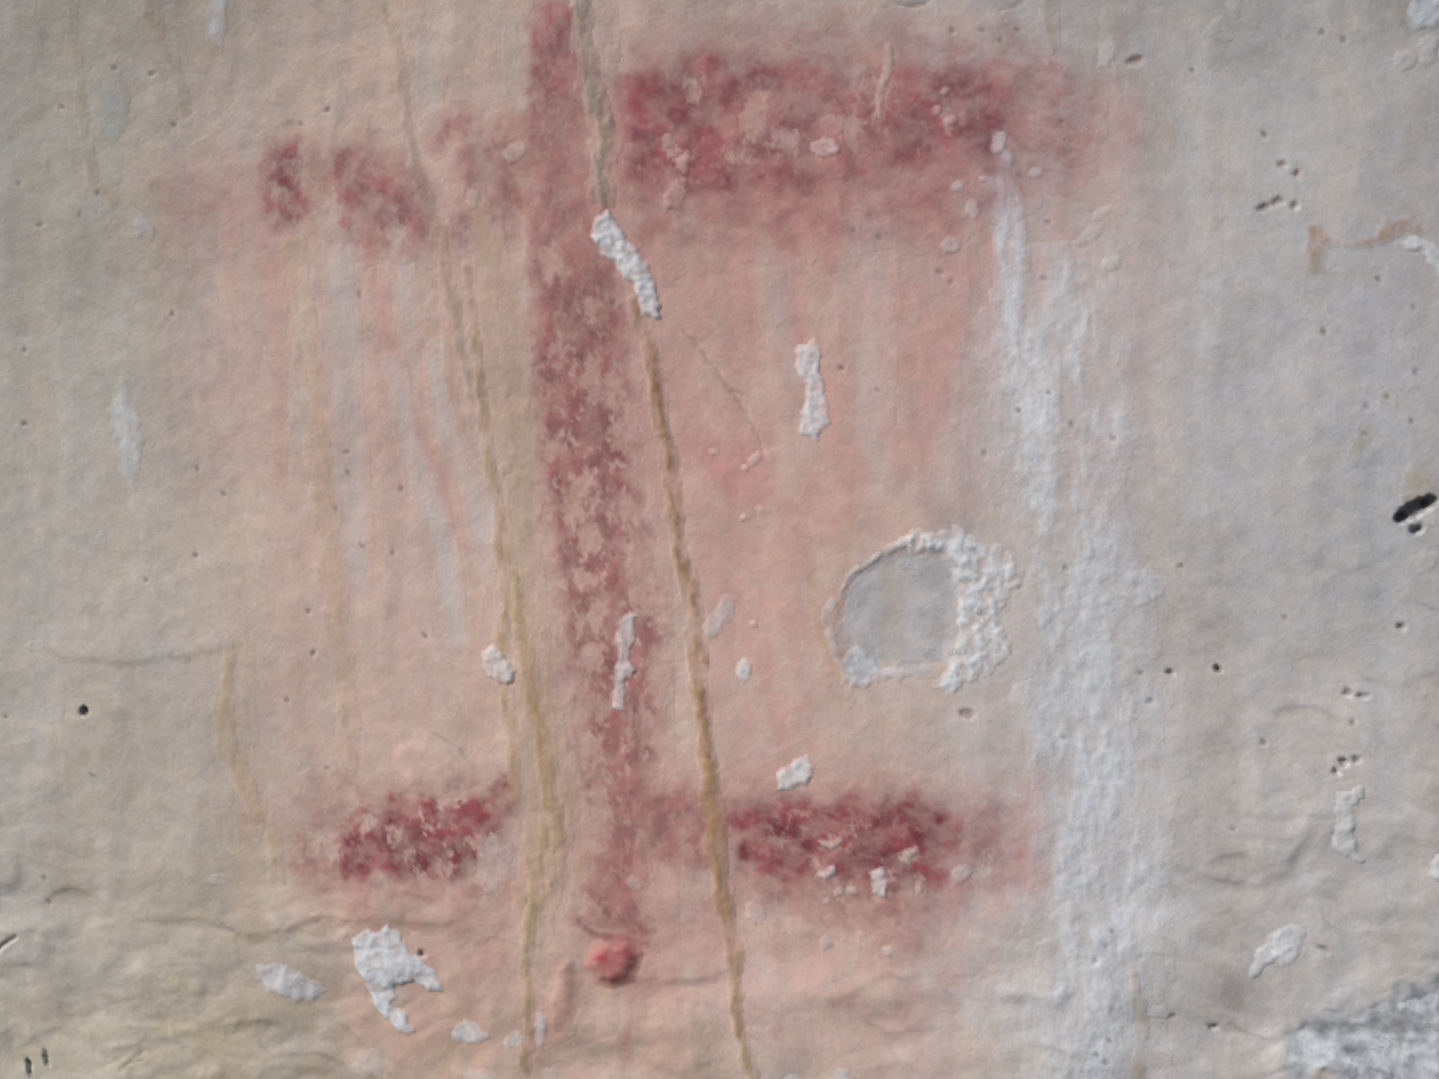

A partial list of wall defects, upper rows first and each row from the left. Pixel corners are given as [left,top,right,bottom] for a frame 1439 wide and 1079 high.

peeling [589,209,662,322]
peeling [793,337,832,442]
leakage [367,0,591,1078]
spalling [819,525,1026,721]
efflorescence [936,216,1191,1079]
peeling [1428,854,1439,882]
crack [0,934,17,951]
peeling [254,961,328,1004]
peeling [325,921,445,1035]
spalling [1265,968,1439,1079]